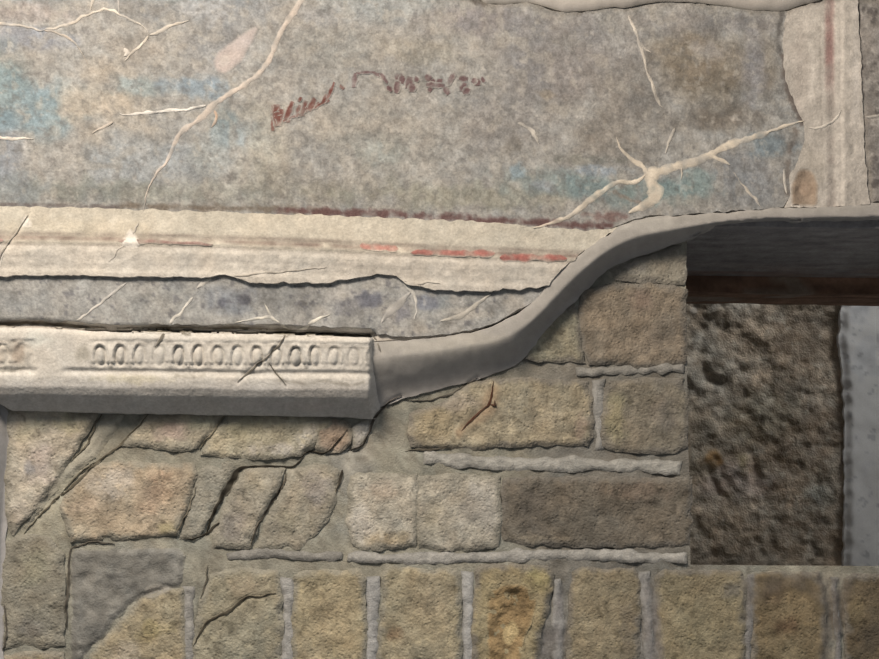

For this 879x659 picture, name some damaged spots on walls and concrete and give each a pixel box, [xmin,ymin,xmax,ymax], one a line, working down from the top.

crack [0,0,189,64]
crack [628,16,664,109]
crack [0,134,32,142]
crack [92,0,305,261]
crack [534,111,841,228]
crack [0,215,28,269]
crack [67,283,126,323]
crack [223,303,330,385]
crack [174,377,497,546]
crack [200,566,208,598]
crack [193,593,275,646]